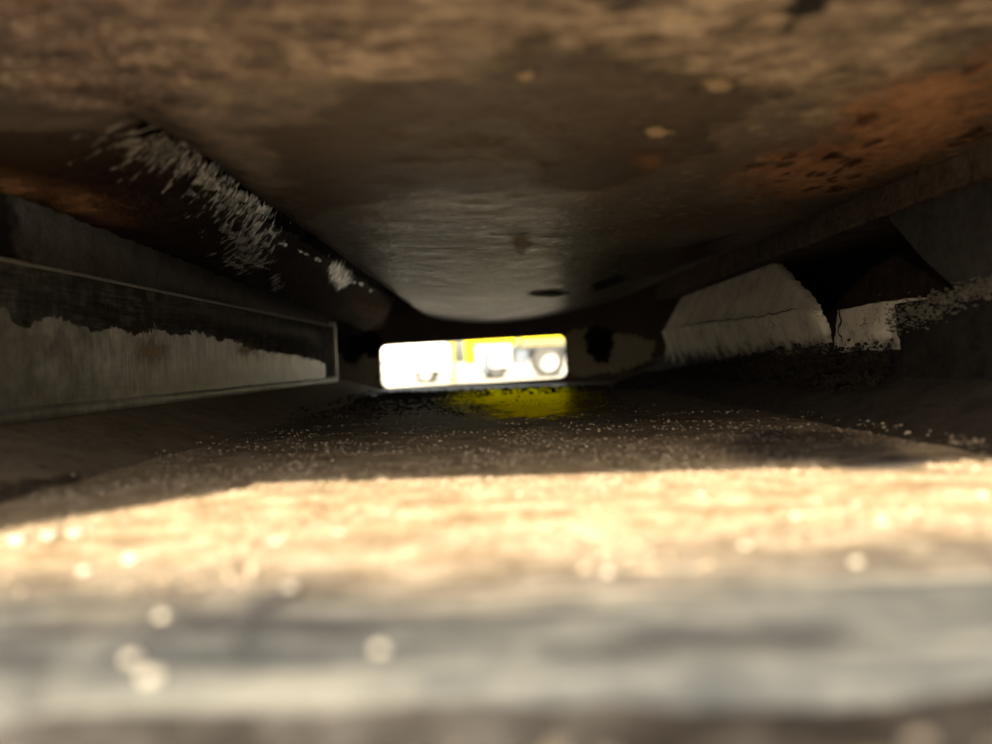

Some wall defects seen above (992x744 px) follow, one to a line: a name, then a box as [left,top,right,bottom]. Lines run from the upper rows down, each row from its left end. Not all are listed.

peeling [0,306,326,410]
leakage [565,325,657,378]